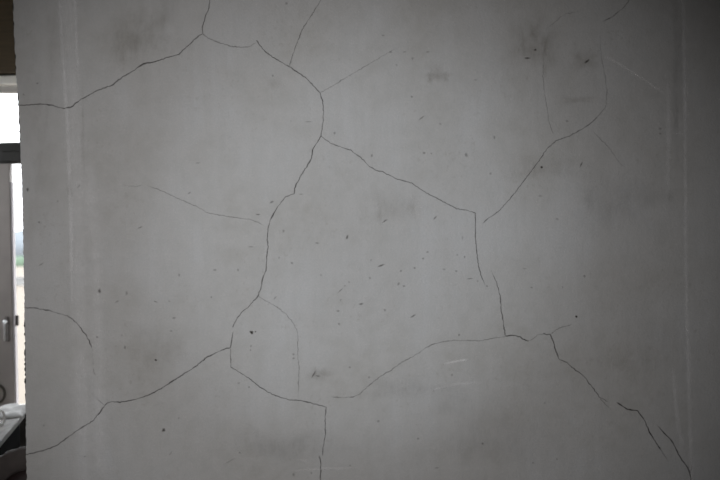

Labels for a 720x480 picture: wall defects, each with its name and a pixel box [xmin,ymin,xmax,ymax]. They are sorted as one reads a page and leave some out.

crack [618,403,691,477]